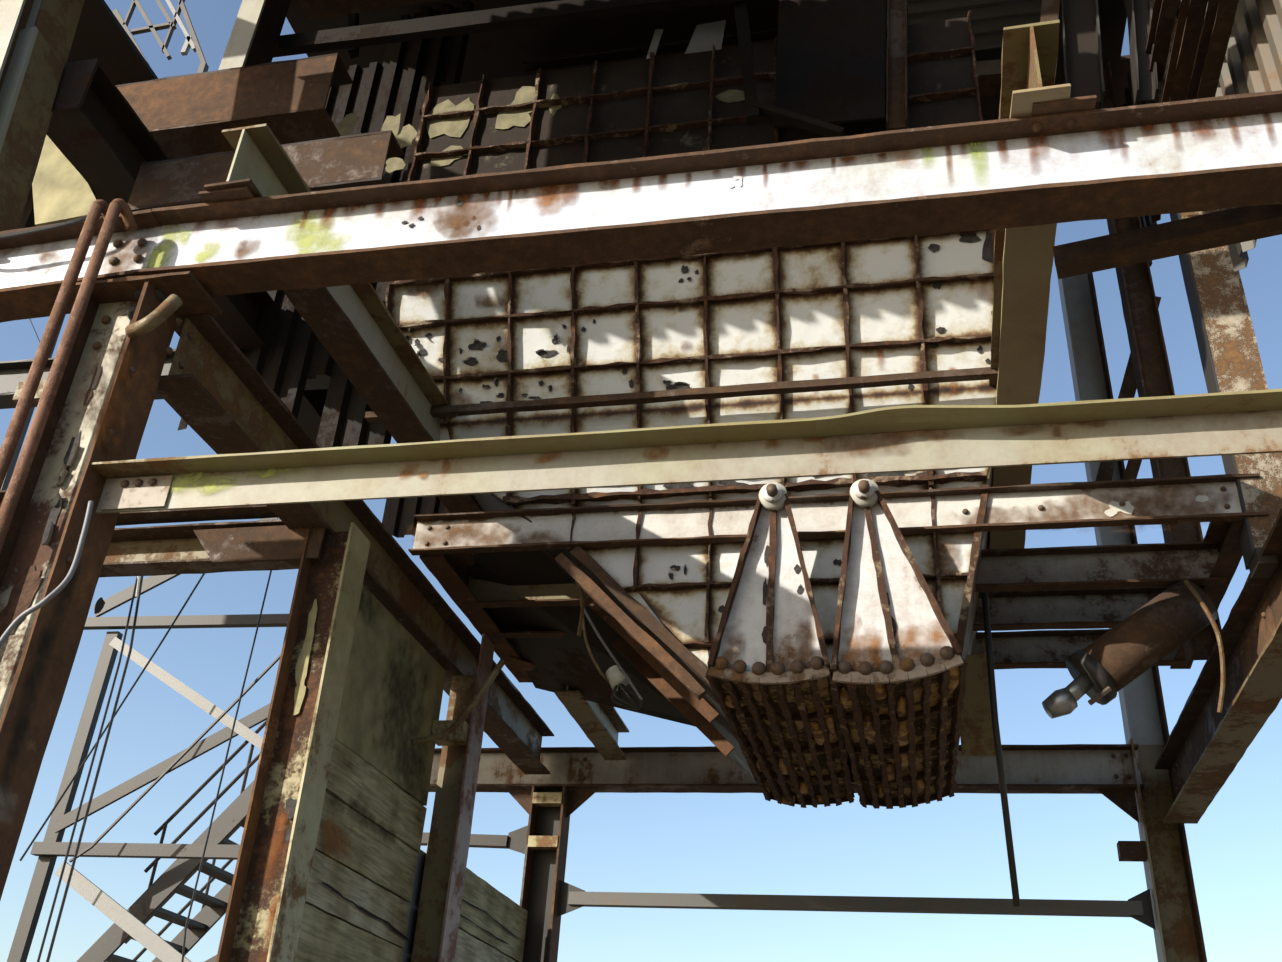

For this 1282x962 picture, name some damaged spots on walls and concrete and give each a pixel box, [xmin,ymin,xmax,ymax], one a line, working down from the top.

peeling [495,86,562,129]
peeling [381,98,474,173]
rust [1142,122,1179,136]
rust [376,197,441,213]
rust [458,183,577,207]
peeling [959,231,994,263]
peeling [536,319,596,357]
peeling [459,336,508,403]
peeling [662,380,691,390]
rust [832,429,947,454]
rust [843,636,881,672]
rust [270,814,287,865]